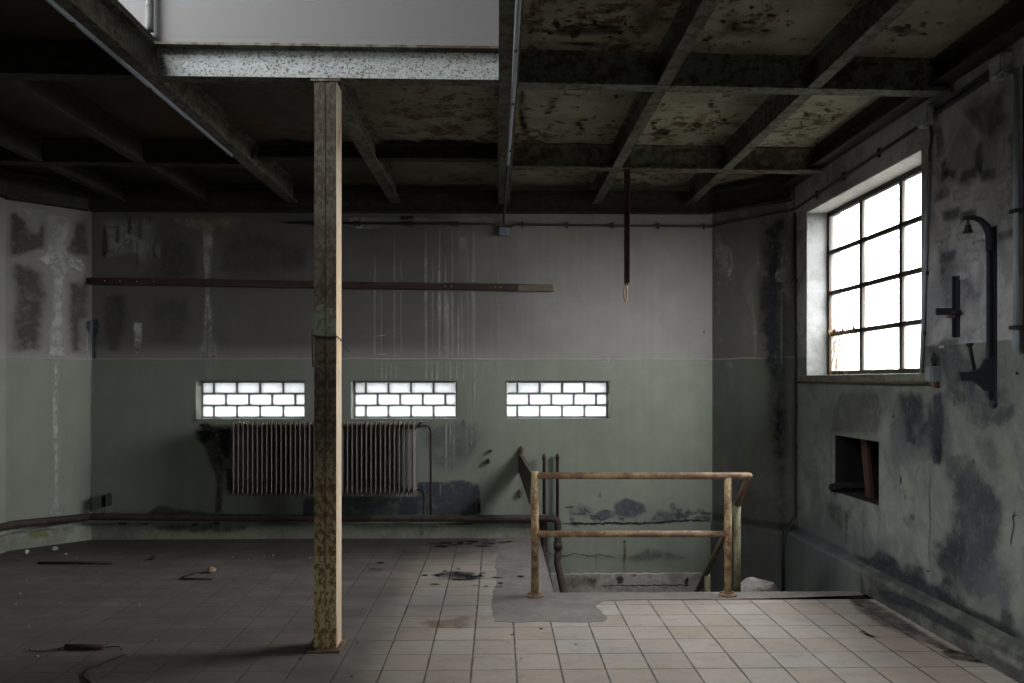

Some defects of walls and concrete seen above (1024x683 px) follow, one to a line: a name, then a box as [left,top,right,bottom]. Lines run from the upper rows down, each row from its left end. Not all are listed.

corrosion [528,3,657,46]
water stain [752,222,785,469]
water stain [892,393,943,463]
water stain [859,471,1015,641]